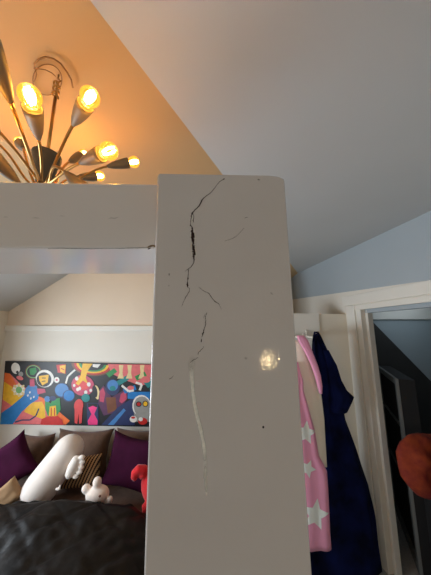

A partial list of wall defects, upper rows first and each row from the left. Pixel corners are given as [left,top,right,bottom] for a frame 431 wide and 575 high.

crack [182,179,223,362]